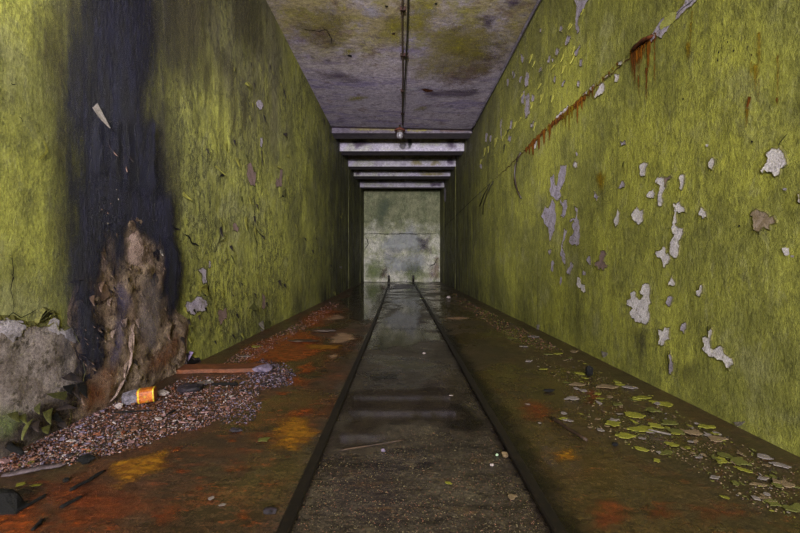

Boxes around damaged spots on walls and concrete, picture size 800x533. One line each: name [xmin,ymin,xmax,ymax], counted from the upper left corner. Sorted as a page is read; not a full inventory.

spalling [0,218,239,459]
leakage [426,19,496,96]
leakage [364,231,580,533]
peeling [480,0,589,169]
crack [450,53,634,221]
corrosion [525,62,618,155]
peeling [541,152,608,293]
peeling [626,283,652,325]
corrosion [630,39,656,95]
peeling [646,173,687,307]
peeling [701,327,735,371]
peeling [760,146,789,178]